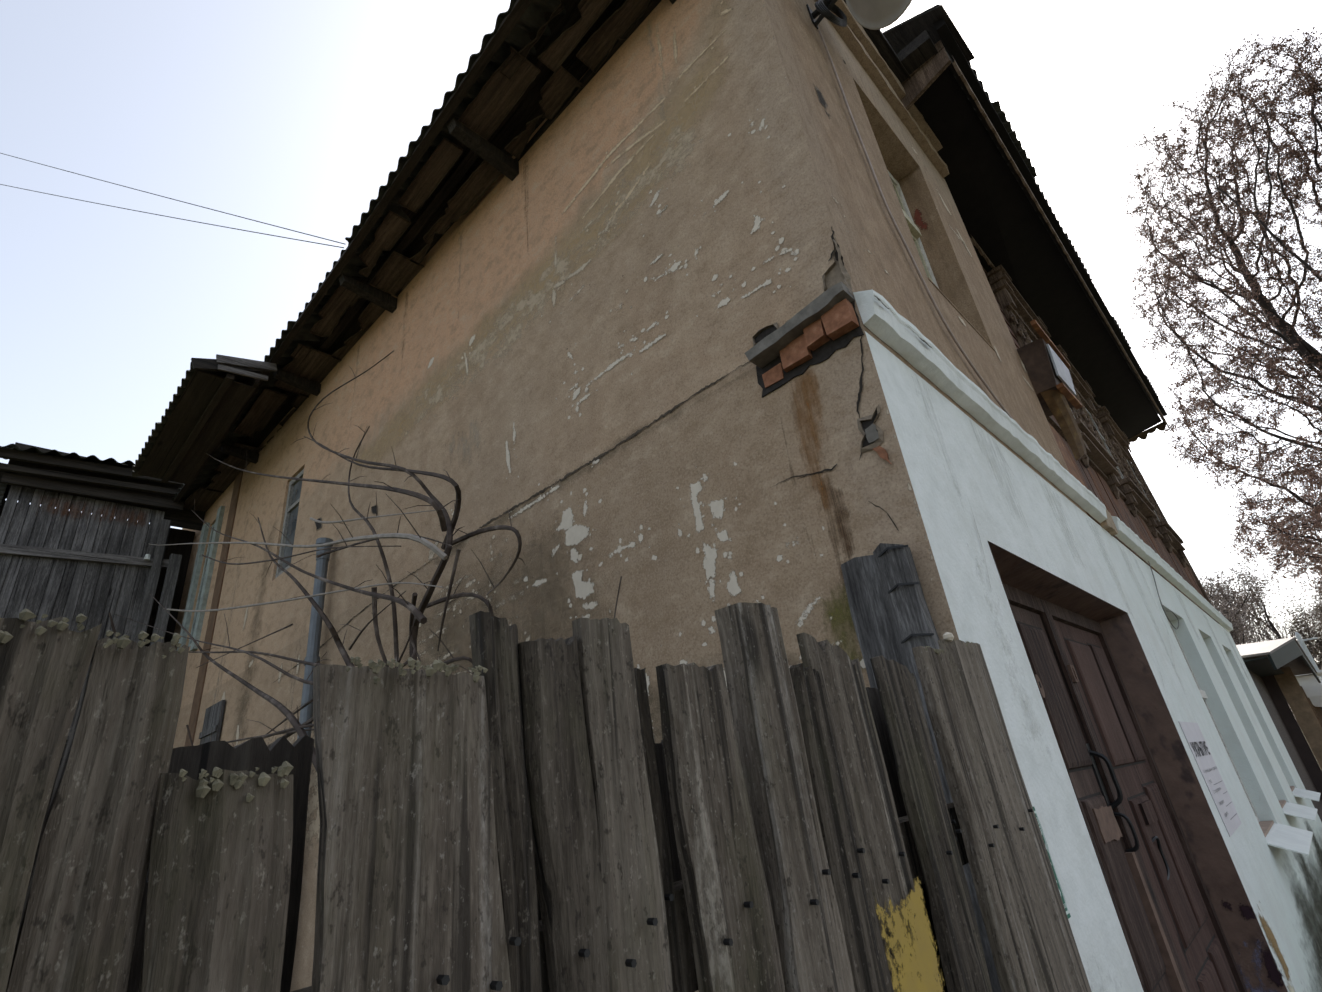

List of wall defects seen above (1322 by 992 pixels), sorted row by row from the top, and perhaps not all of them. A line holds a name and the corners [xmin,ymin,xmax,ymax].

peeling [405,1,745,435]
peeling [711,215,799,309]
flaking render [745,197,864,398]
crack [828,227,844,266]
crack [856,335,864,418]
crack [772,453,862,487]
peeling [417,483,658,675]
peeling [676,465,743,646]
peeling [797,597,820,627]
peeling [306,771,320,842]
peeling [1221,900,1304,992]
mould [1295,830,1322,988]